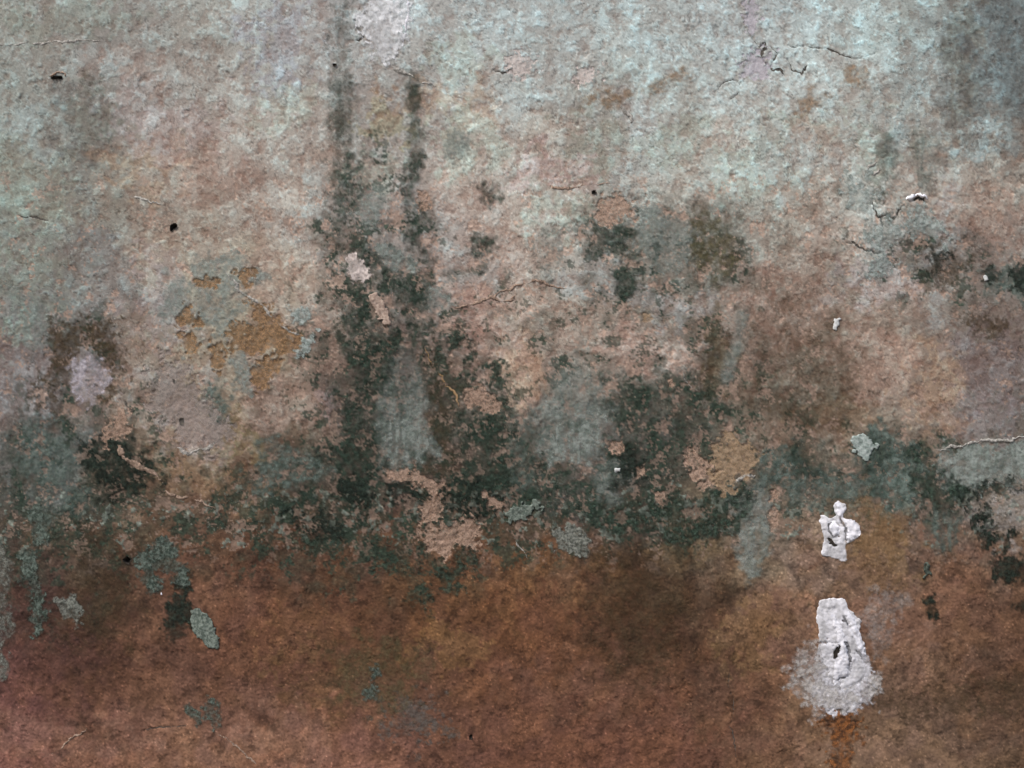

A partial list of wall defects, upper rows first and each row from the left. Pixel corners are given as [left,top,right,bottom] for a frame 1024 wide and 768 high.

crack [754,41,859,76]
water stain [333,153,455,391]
water stain [471,232,494,274]
water stain [613,266,645,301]
spalling [141,267,321,460]
water stain [77,426,167,503]
water stain [331,331,608,574]
water stain [608,443,647,492]
water stain [578,480,773,577]
water stain [907,441,1024,584]
water stain [783,640,882,716]
corrosion [815,705,868,768]